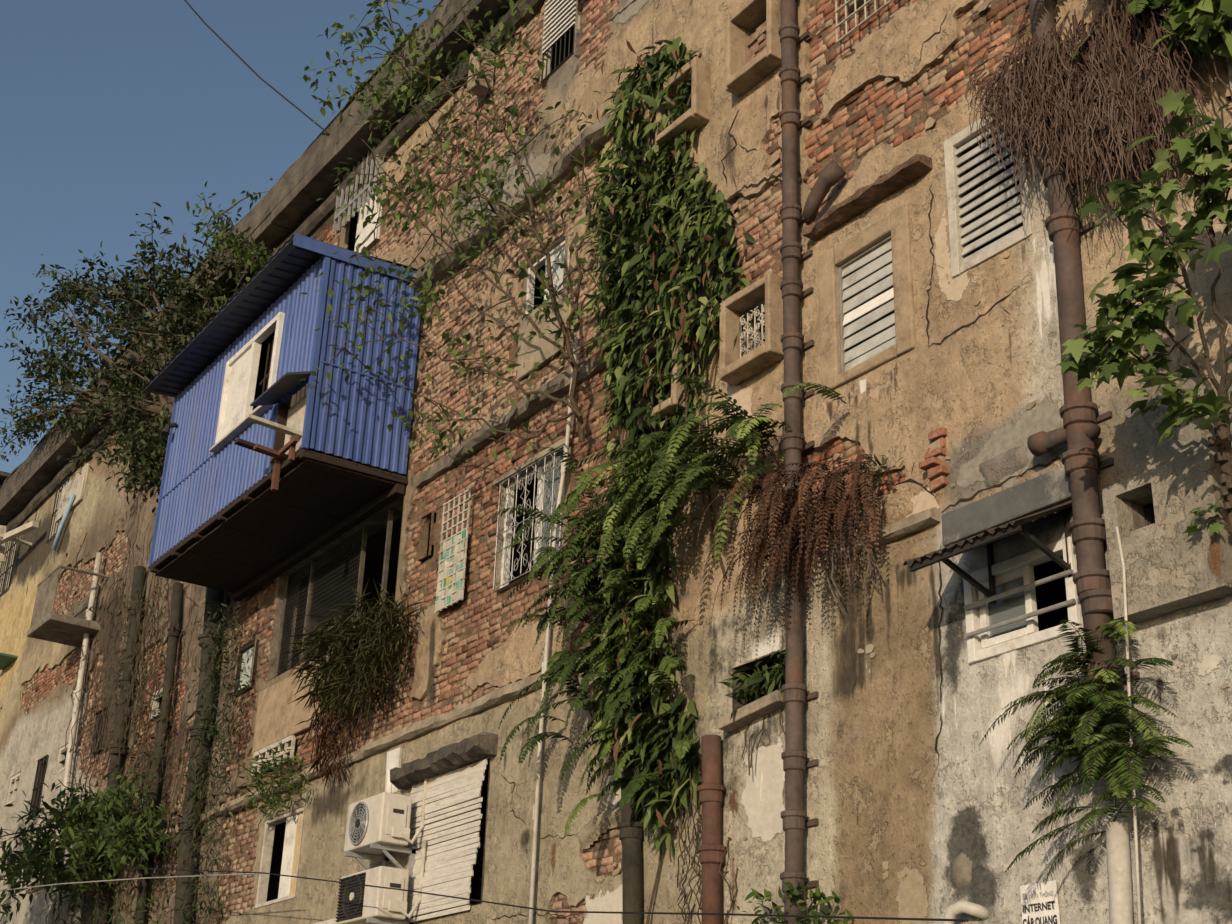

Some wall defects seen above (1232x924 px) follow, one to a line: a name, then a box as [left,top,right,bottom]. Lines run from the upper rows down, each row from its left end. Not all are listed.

spalling [370,10,551,257]
crack [721,111,782,208]
spalling [727,116,783,296]
spalling [798,0,1032,224]
crack [926,186,1019,348]
peeling [944,399,1061,490]
spalling [215,146,623,924]
damp [837,580,873,696]
crack [934,545,948,770]
damp [1213,755,1232,785]
damp [941,806,996,909]
damp [1152,808,1232,923]